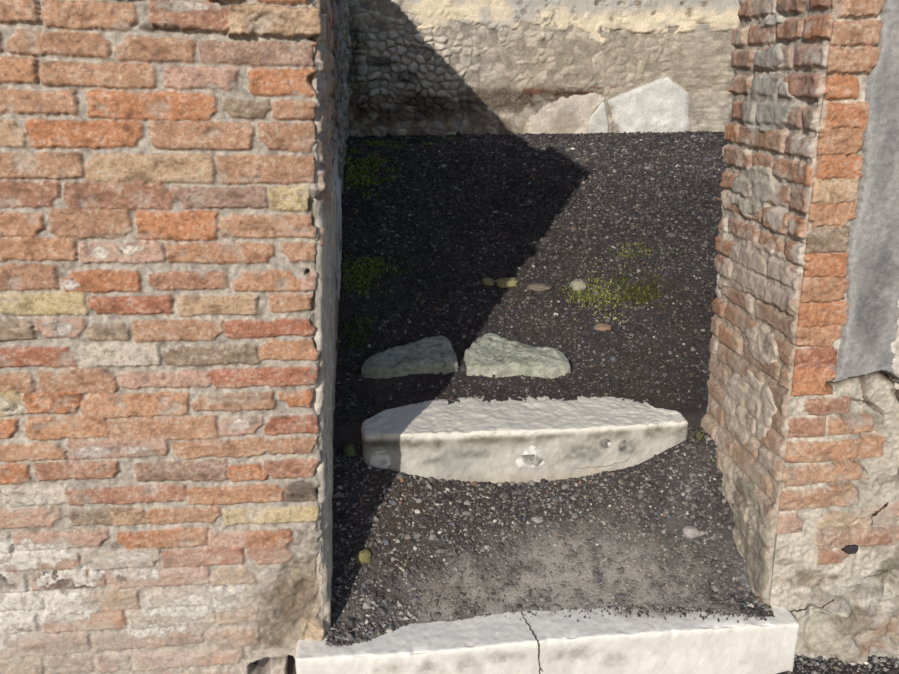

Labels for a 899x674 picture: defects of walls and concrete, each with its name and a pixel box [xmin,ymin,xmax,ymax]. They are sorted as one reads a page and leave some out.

flaking render [404,0,740,46]
crack [521,611,543,674]